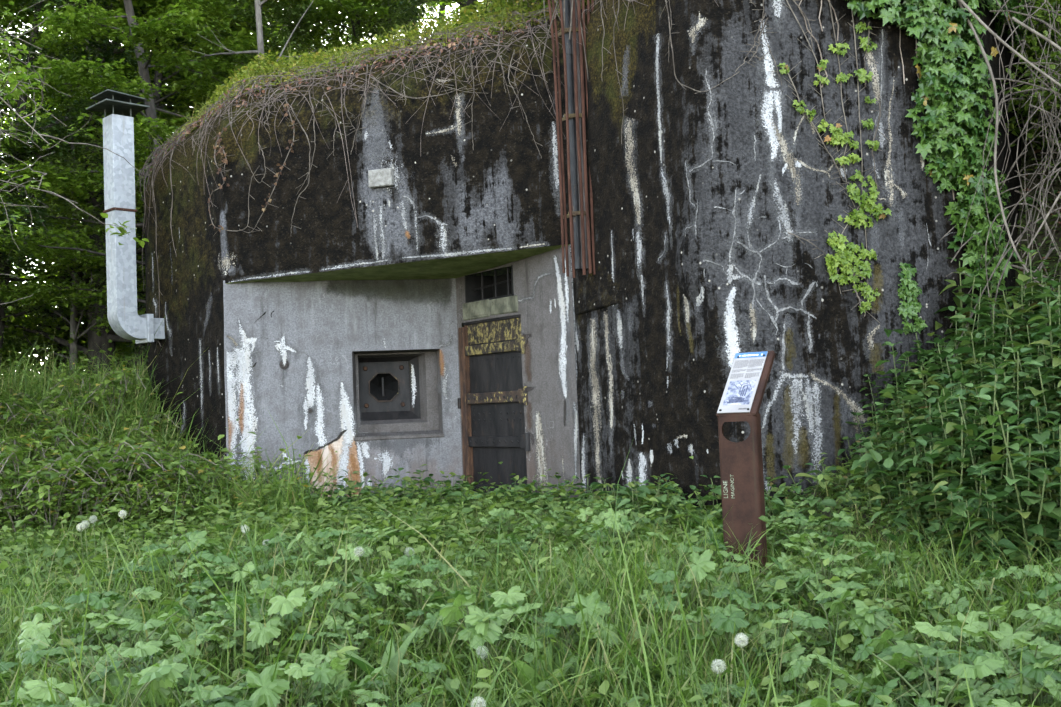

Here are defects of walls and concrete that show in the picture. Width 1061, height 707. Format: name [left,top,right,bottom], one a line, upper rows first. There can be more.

crack [689,11,706,43]
leakage [773,0,784,18]
leakage [655,33,671,224]
leakage [760,23,801,241]
leakage [231,200,545,282]
leakage [624,117,644,305]
crack [658,70,866,428]
leakage [303,357,328,449]
leakage [339,382,356,445]
leakage [535,411,548,495]
leakage [549,244,623,497]
leakage [723,287,758,367]